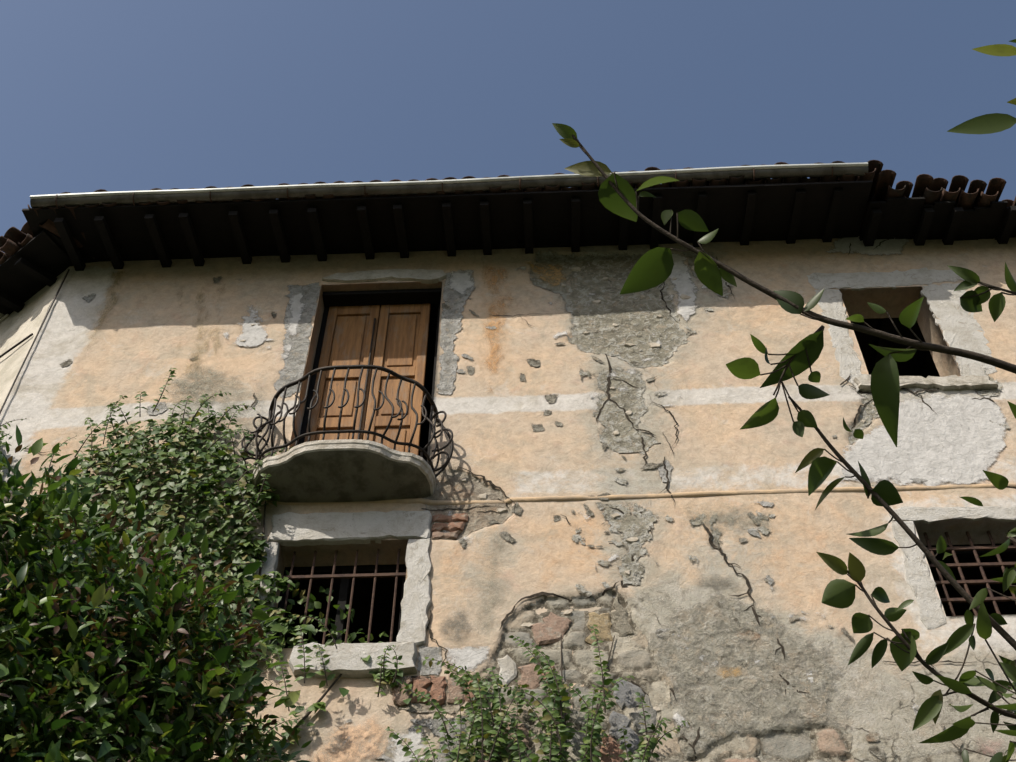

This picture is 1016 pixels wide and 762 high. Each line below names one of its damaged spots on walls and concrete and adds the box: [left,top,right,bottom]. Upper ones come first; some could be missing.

spalling [456,354,474,375]
peeling [514,250,713,485]
crack [596,354,678,502]
spalling [832,391,879,444]
spalling [424,469,523,548]
crack [499,581,619,631]
flaking render [391,493,855,762]
crack [700,520,810,704]
flaking render [865,732,896,762]
flaking render [909,738,1016,762]